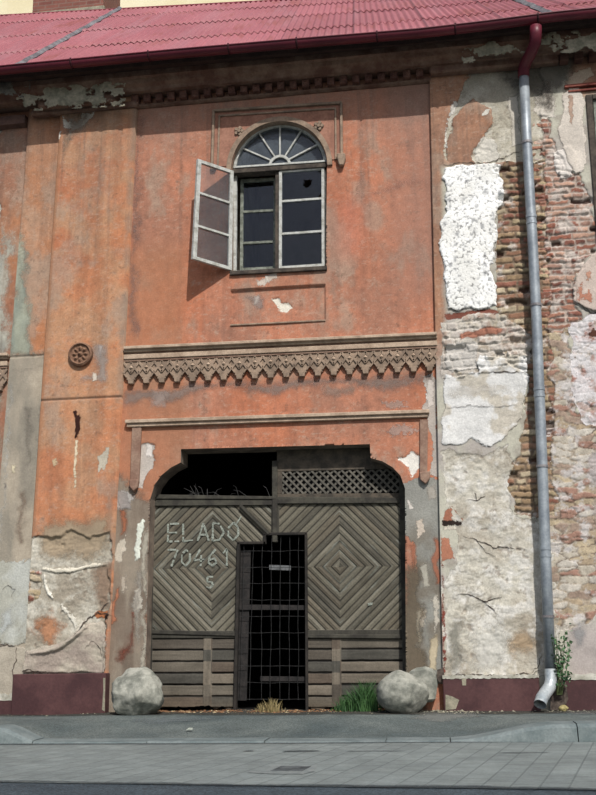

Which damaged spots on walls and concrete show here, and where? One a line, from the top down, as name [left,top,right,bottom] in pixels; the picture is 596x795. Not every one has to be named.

peeling [462,41,525,64]
peeling [541,30,596,53]
peeling [0,80,126,140]
peeling [256,273,277,286]
peeling [249,296,292,313]
flaking render [411,68,596,685]
peeling [388,423,419,437]
rust [73,411,81,487]
peeling [117,443,155,510]
peeling [398,451,420,478]
flaking render [24,519,143,661]
crack [75,602,113,634]